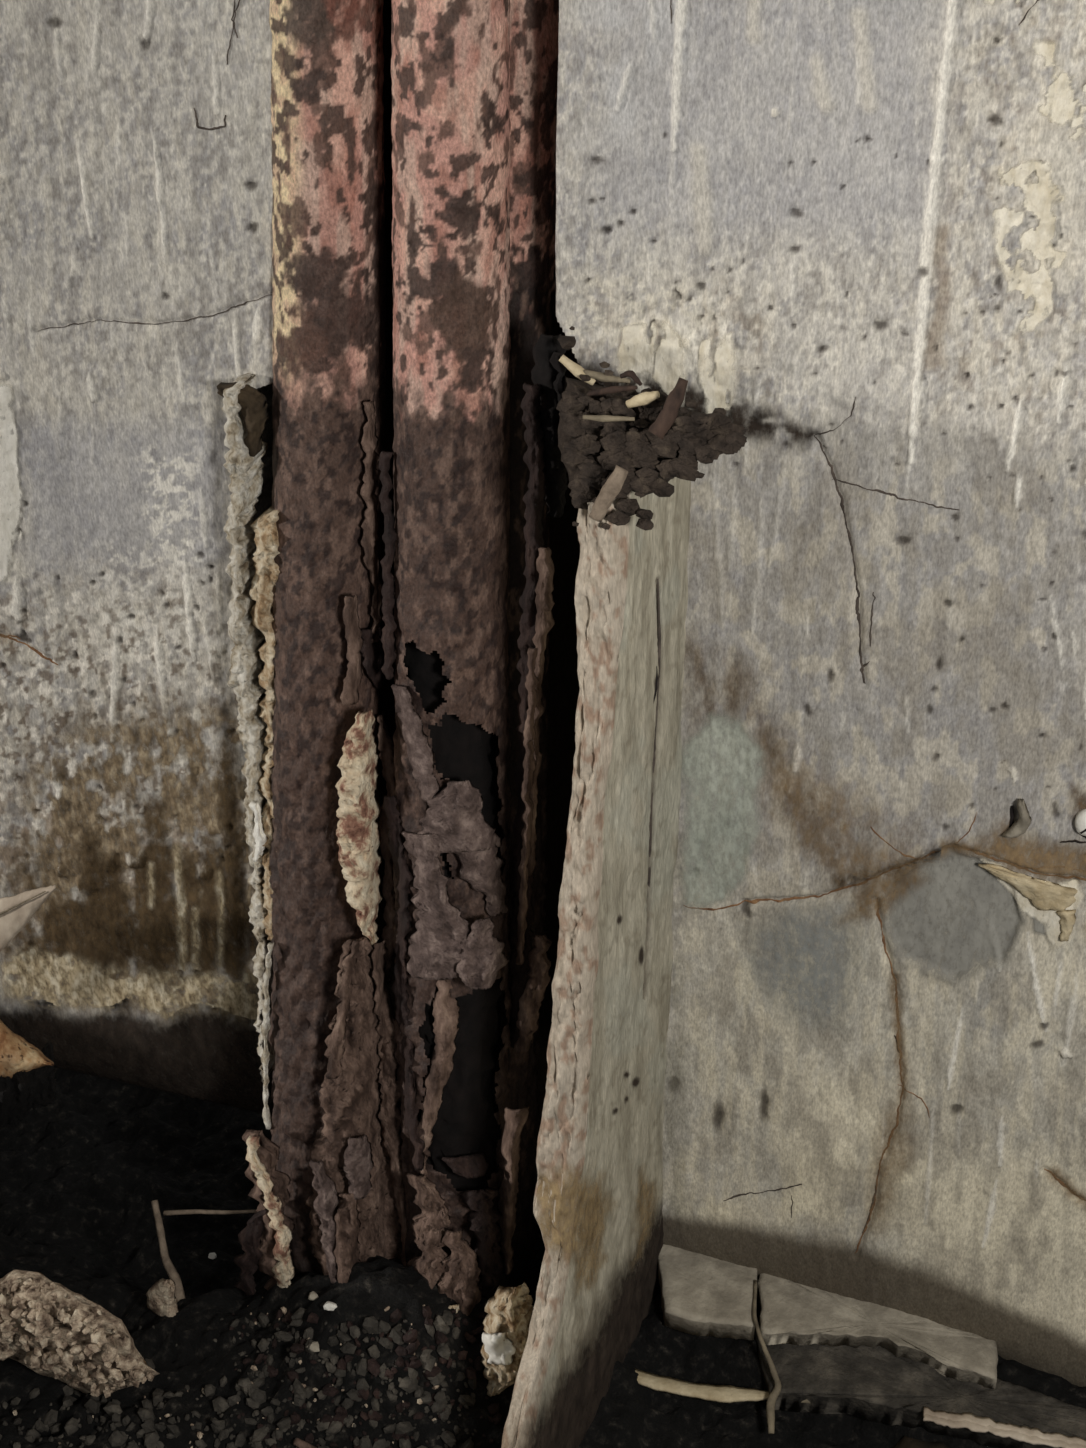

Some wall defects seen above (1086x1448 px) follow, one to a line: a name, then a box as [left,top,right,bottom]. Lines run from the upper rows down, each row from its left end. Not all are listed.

crack [39,294,272,331]
peeling [618,323,735,414]
peeling [0,385,22,582]
crack [814,397,959,684]
crack [0,634,58,665]
water stain [2,704,259,1029]
rust [233,333,568,1397]
spalling [886,848,1084,981]
crack [683,812,1086,1253]
rust [537,1171,609,1287]